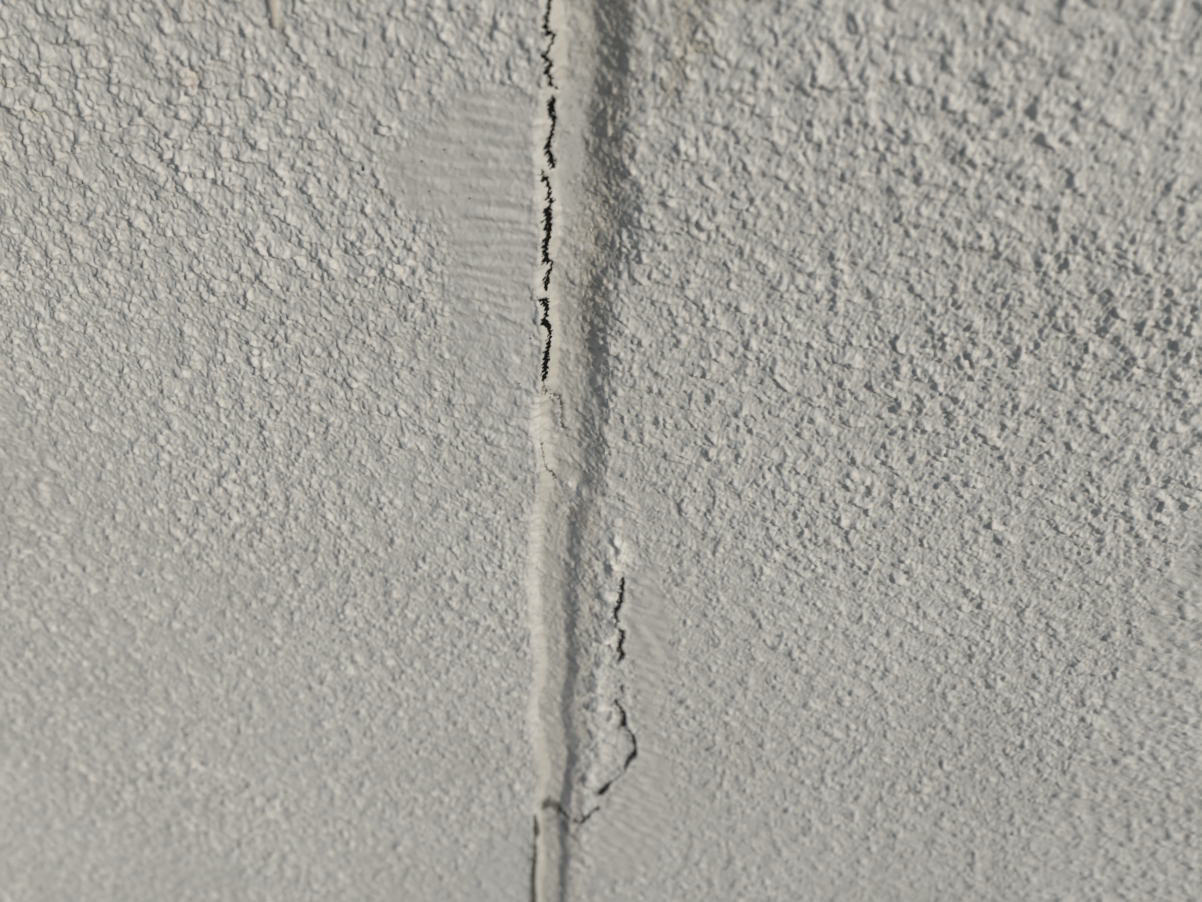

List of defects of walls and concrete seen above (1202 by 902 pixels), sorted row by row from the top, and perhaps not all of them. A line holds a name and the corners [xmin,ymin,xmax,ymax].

crack [537,0,566,480]
crack [529,577,638,902]